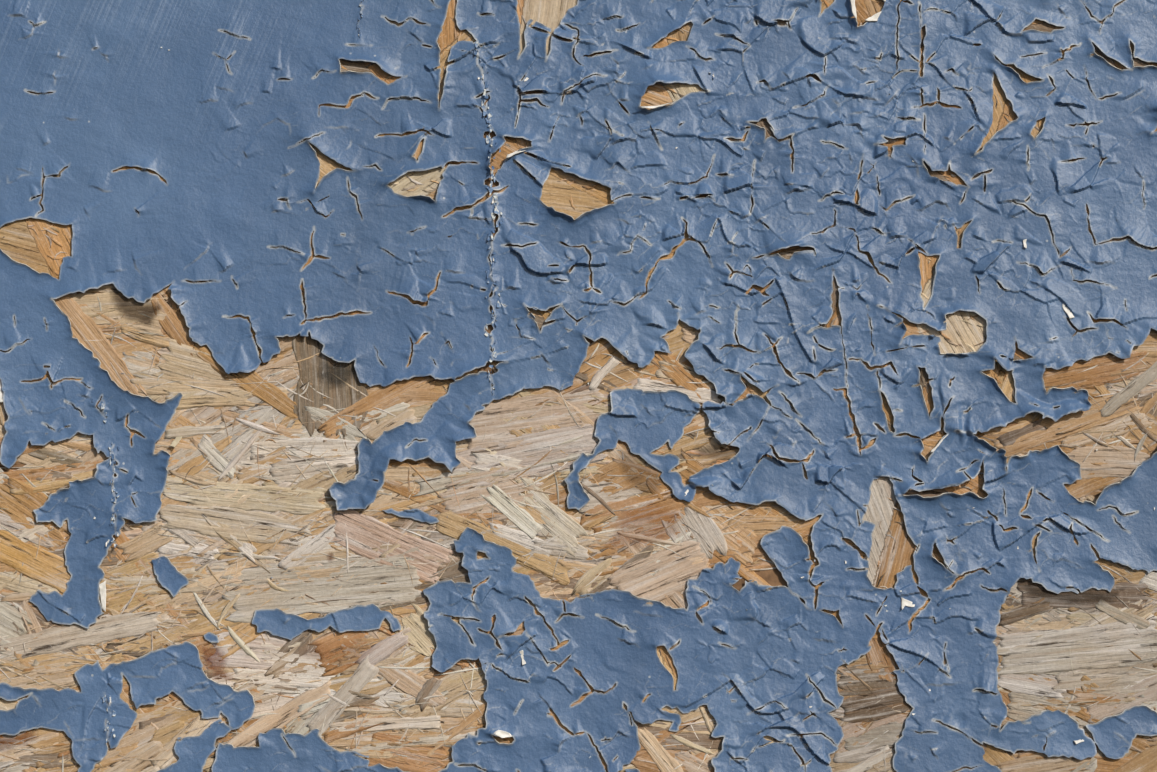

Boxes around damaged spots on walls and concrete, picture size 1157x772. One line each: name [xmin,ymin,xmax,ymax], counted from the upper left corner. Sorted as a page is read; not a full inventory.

peeling [509,0,586,70]
peeling [911,18,935,85]
crack [891,0,968,114]
peeling [1014,0,1157,80]
crack [296,20,613,393]
peeling [481,129,624,230]
crack [568,213,700,311]
peeling [847,45,1054,214]
crack [968,164,1157,345]
crack [218,311,268,366]
crack [713,190,961,485]
peeling [0,210,1157,772]